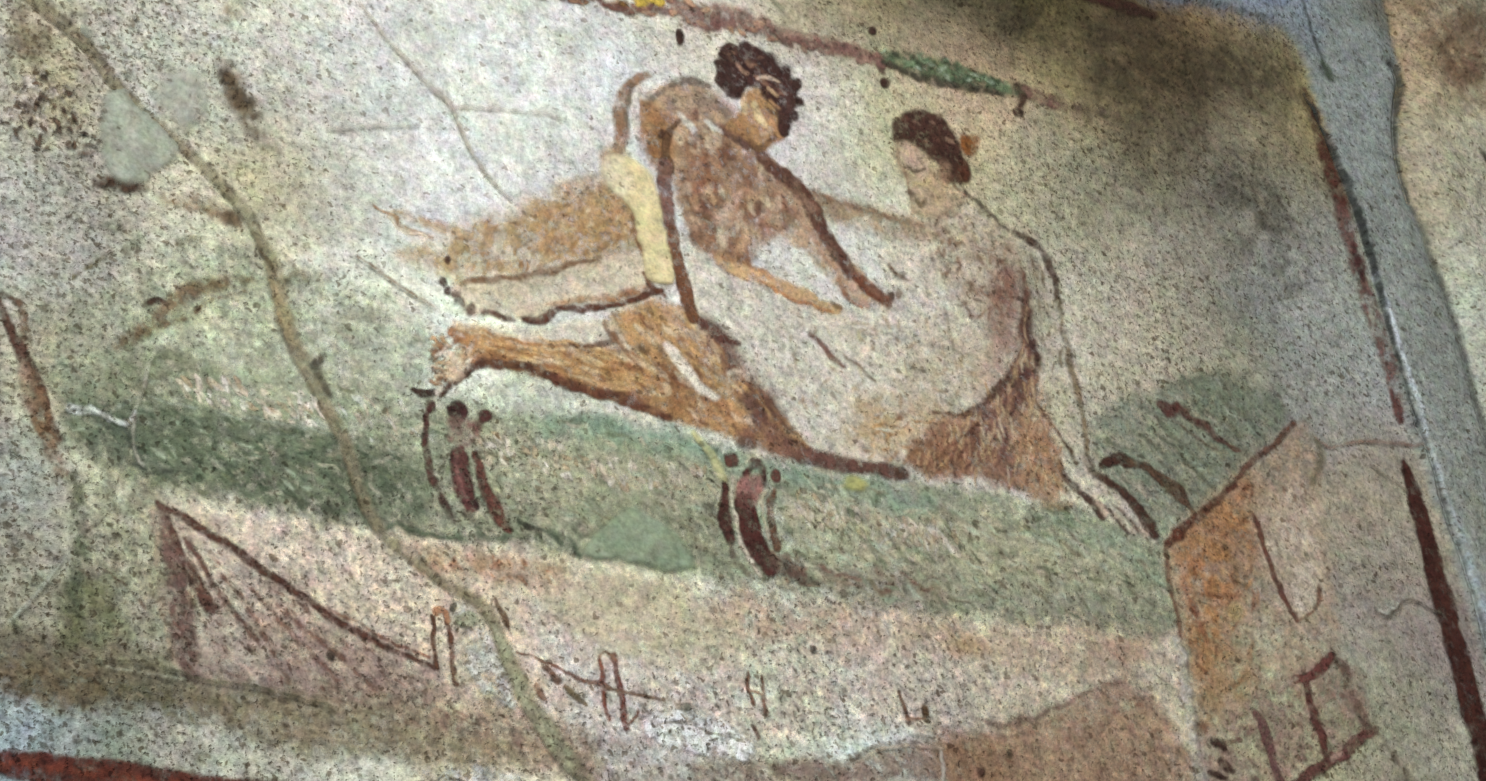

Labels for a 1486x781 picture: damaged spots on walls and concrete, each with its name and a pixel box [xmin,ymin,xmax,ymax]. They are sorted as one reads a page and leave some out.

crack [12,557,64,618]
crack [26,0,596,781]